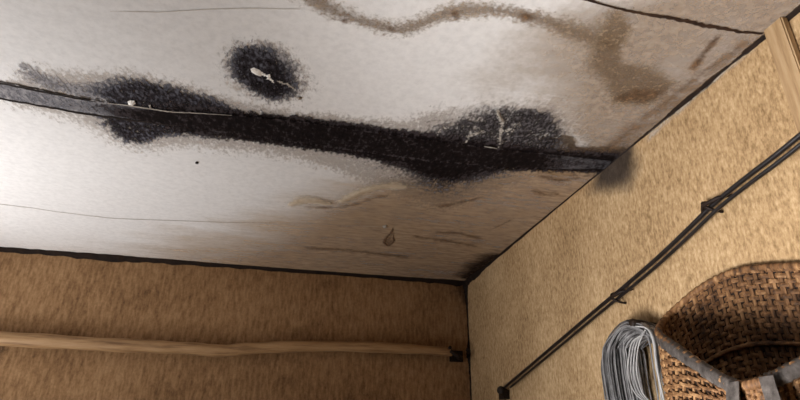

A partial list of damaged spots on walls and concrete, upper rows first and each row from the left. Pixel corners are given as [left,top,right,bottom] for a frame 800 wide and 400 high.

crack [584,0,763,35]
peeling [251,68,301,100]
water stain [0,0,800,304]